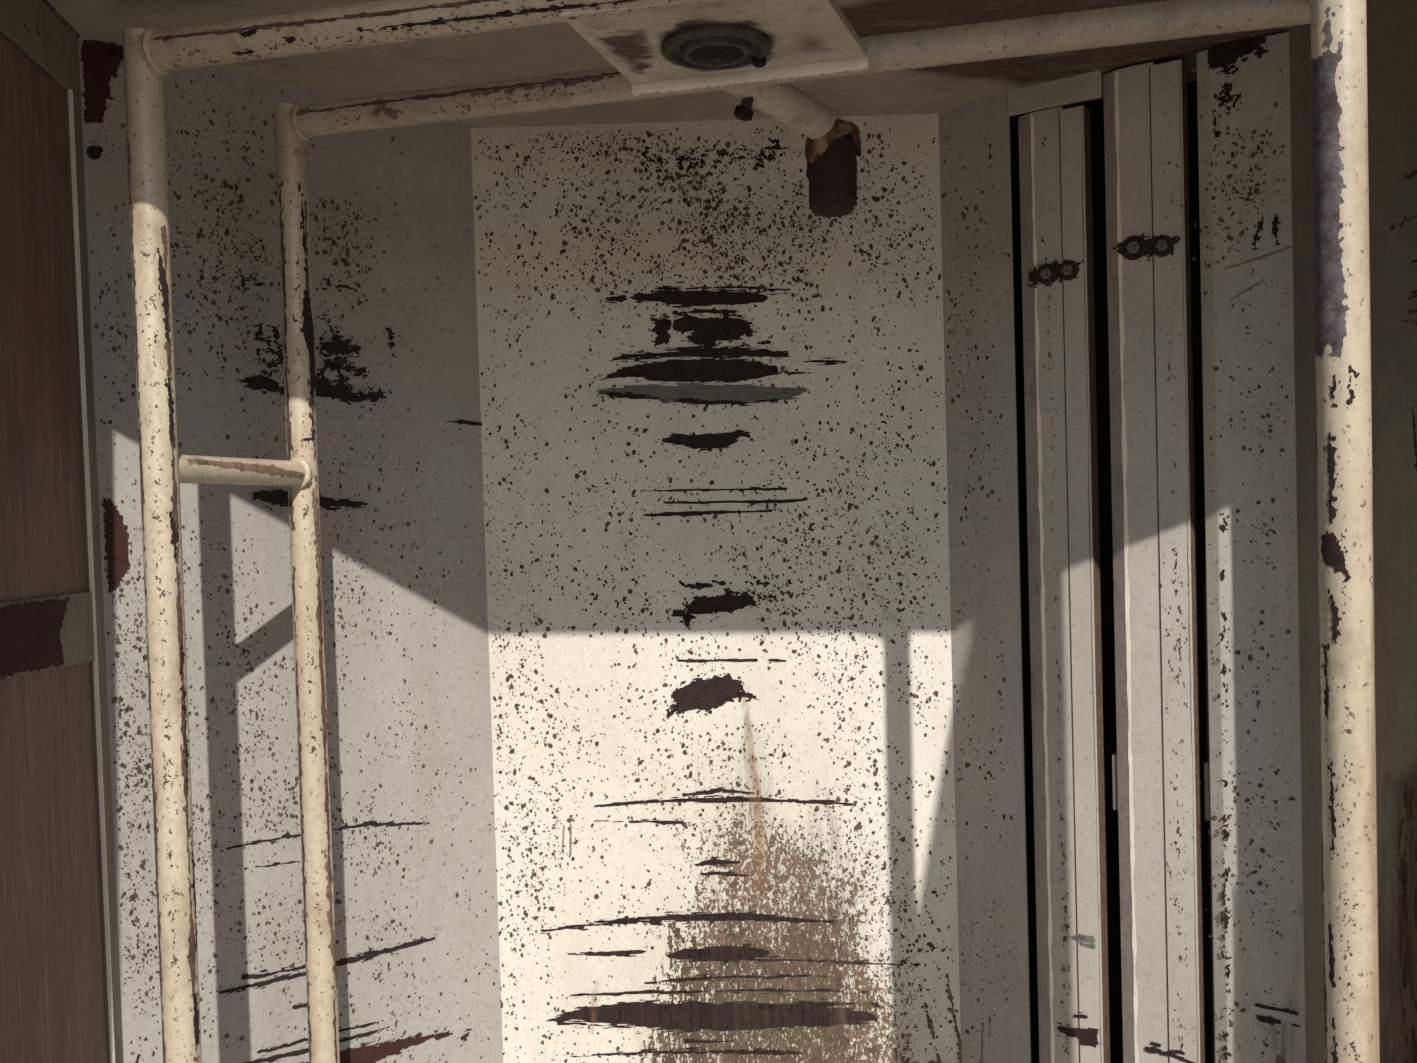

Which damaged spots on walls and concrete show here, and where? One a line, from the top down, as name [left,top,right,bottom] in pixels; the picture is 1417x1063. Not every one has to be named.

peeling [81,40,124,127]
peeling [237,316,284,401]
peeling [292,183,392,443]
peeling [385,327,397,357]
peeling [602,292,628,303]
peeling [650,303,773,351]
peeling [101,497,132,593]
corrosion [161,74,1024,1063]
peeling [669,574,793,627]
peeling [663,673,759,721]
peeling [190,827,198,949]
peeling [340,1028,472,1063]